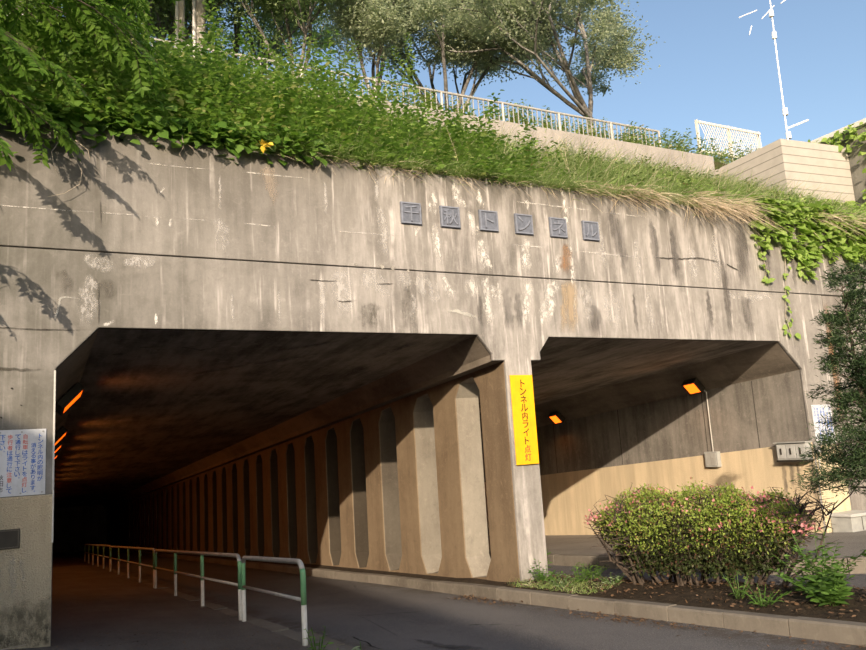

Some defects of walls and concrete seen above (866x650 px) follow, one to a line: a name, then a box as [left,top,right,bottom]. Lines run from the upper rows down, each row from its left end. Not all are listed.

corrosion [560,246,570,269]
leakage [599,212,624,260]
leakage [670,231,679,269]
crack [660,257,737,270]
leakage [739,235,748,272]
leakage [468,279,500,320]
leakage [541,282,557,324]